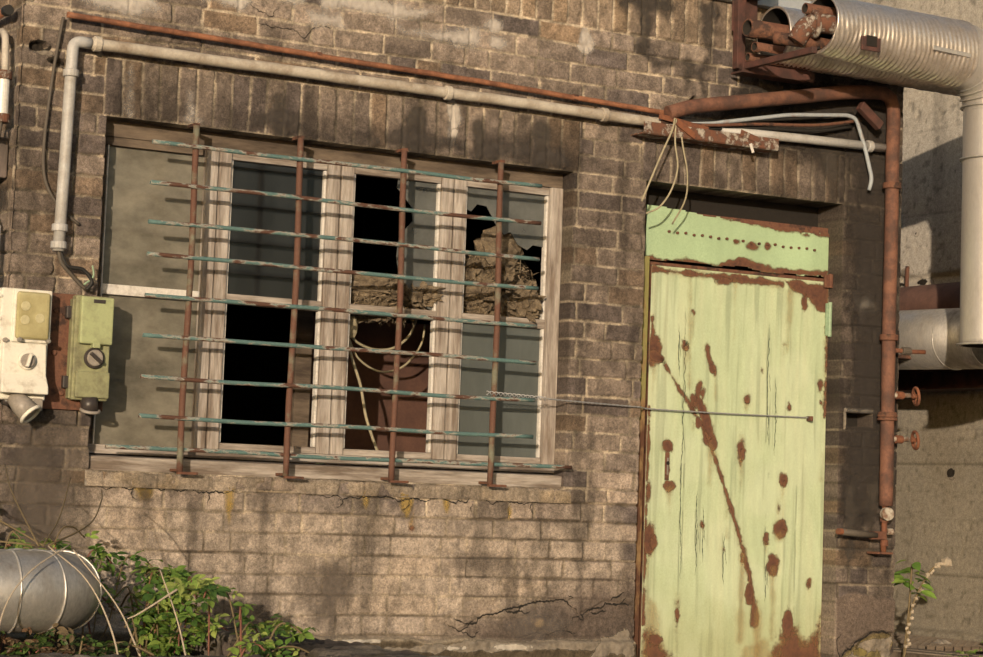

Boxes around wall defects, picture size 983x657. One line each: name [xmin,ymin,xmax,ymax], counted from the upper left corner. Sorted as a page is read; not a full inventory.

rust [817,336,828,418]
rust [649,316,759,628]
rust [641,405,672,657]
rust [763,506,788,576]
crack [447,592,631,638]
rust [771,610,821,657]